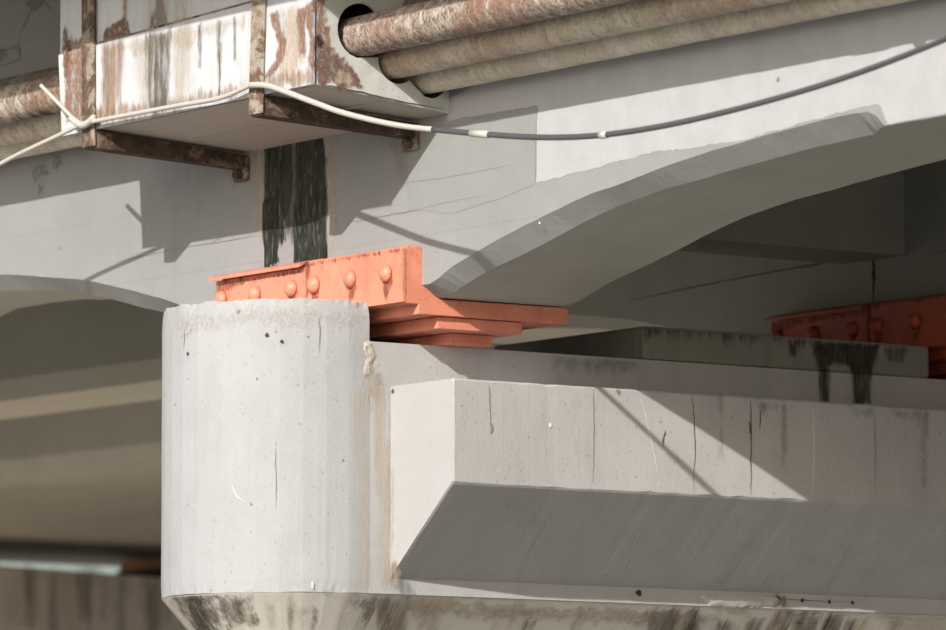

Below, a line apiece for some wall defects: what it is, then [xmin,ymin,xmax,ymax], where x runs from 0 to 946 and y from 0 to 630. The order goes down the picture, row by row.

rust [62,27,82,121]
rust [96,0,153,124]
rust [264,0,326,86]
leakage [262,138,327,268]
leakage [813,342,906,404]
leakage [170,594,259,630]
leakage [358,598,407,630]
leakage [648,608,700,630]
leakage [747,611,863,630]